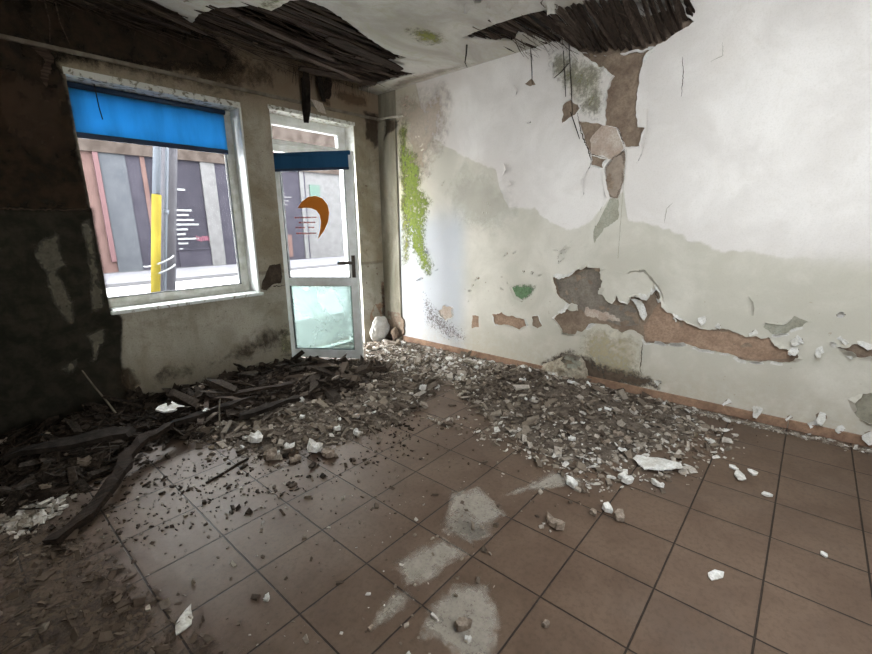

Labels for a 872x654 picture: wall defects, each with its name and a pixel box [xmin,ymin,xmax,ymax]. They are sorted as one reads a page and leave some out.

peeling [540,0,556,15]
spalling [559,47,655,169]
leakage [0,0,272,435]
spalling [551,244,813,366]
peeling [492,310,543,331]
leakage [235,330,290,359]
spalling [815,336,872,362]
peeling [807,412,827,429]
spalling [848,392,872,445]